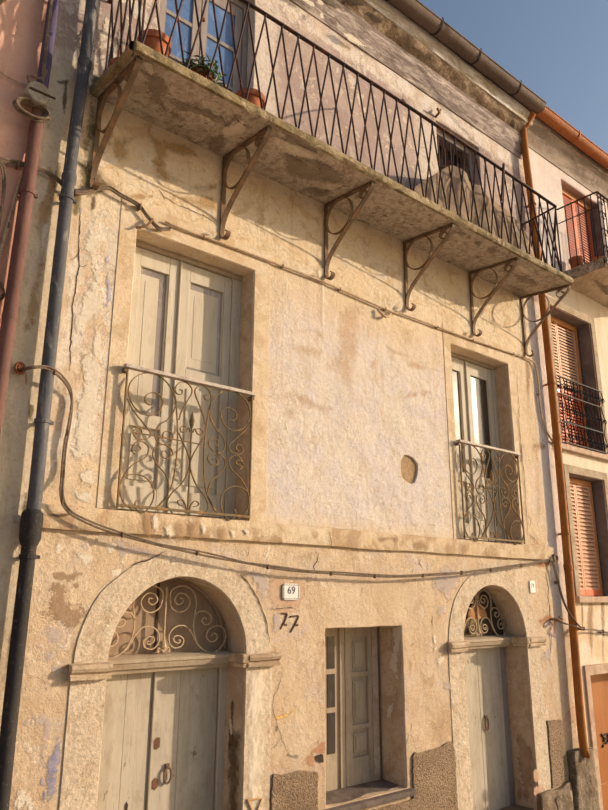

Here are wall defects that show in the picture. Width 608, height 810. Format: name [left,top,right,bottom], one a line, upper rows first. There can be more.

spalling [303,0,381,23]
crack [69,212,88,365]
flaking render [72,203,111,458]
flaking render [103,537,152,557]
spalling [40,541,94,674]
flaking render [13,787,39,810]
peeling [24,715,62,799]
water stain [228,701,240,810]
water stain [249,673,262,798]